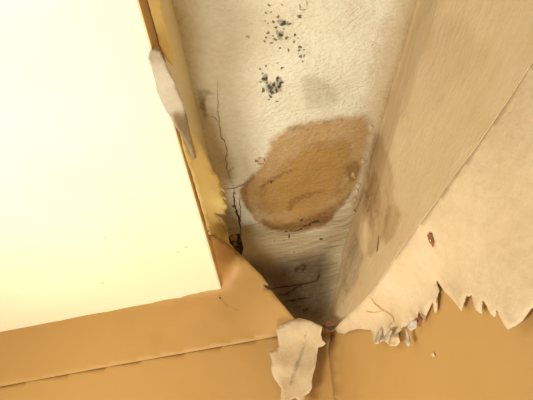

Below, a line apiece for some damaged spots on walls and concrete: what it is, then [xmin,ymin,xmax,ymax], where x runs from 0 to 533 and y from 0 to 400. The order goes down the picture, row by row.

crack [211,80,248,237]
spalling [229,233,243,255]
crack [270,272,319,301]
leakage [242,0,416,238]
peeling [326,61,533,347]